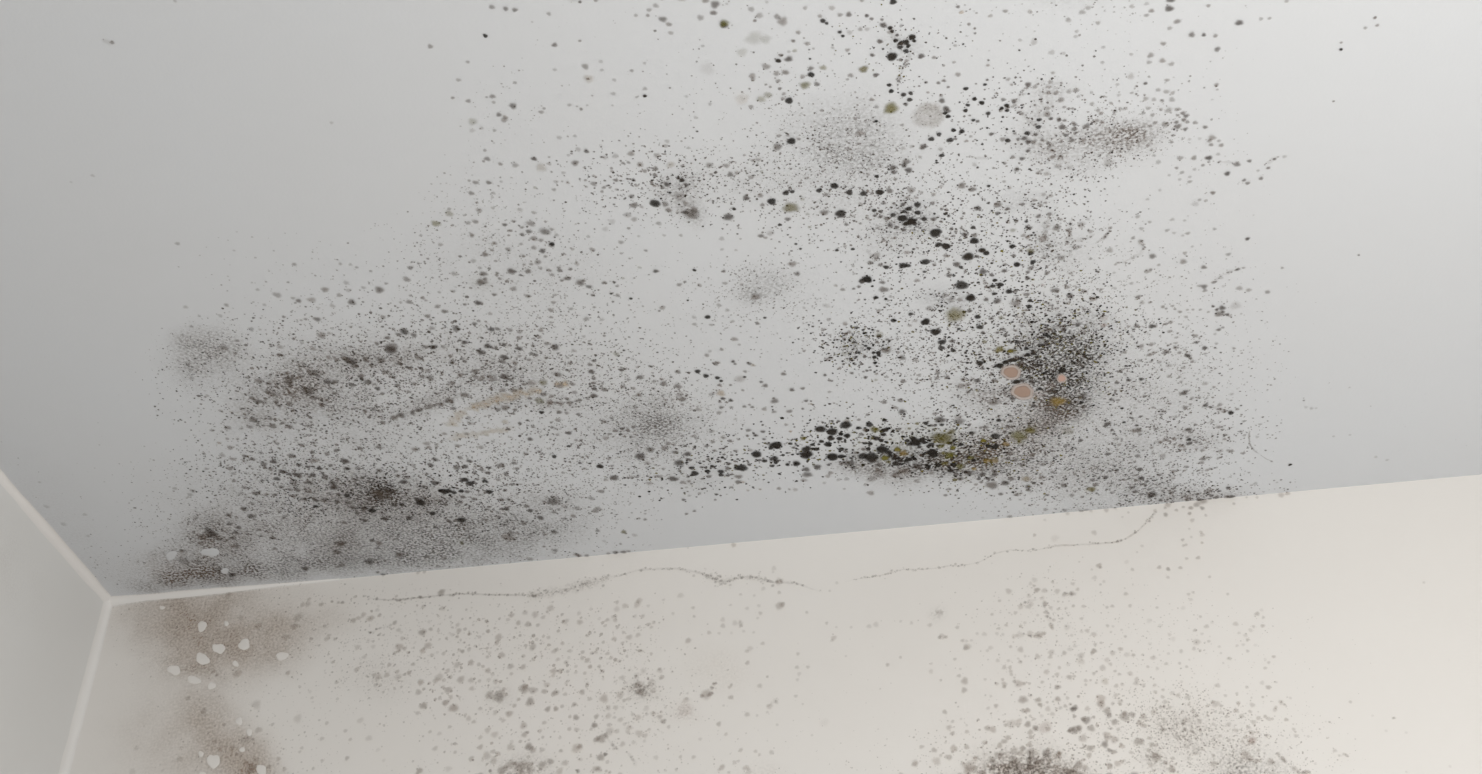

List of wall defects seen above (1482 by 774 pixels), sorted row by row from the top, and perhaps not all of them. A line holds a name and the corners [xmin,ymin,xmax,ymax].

damp [134,0,1289,689]
damp [198,717,266,774]